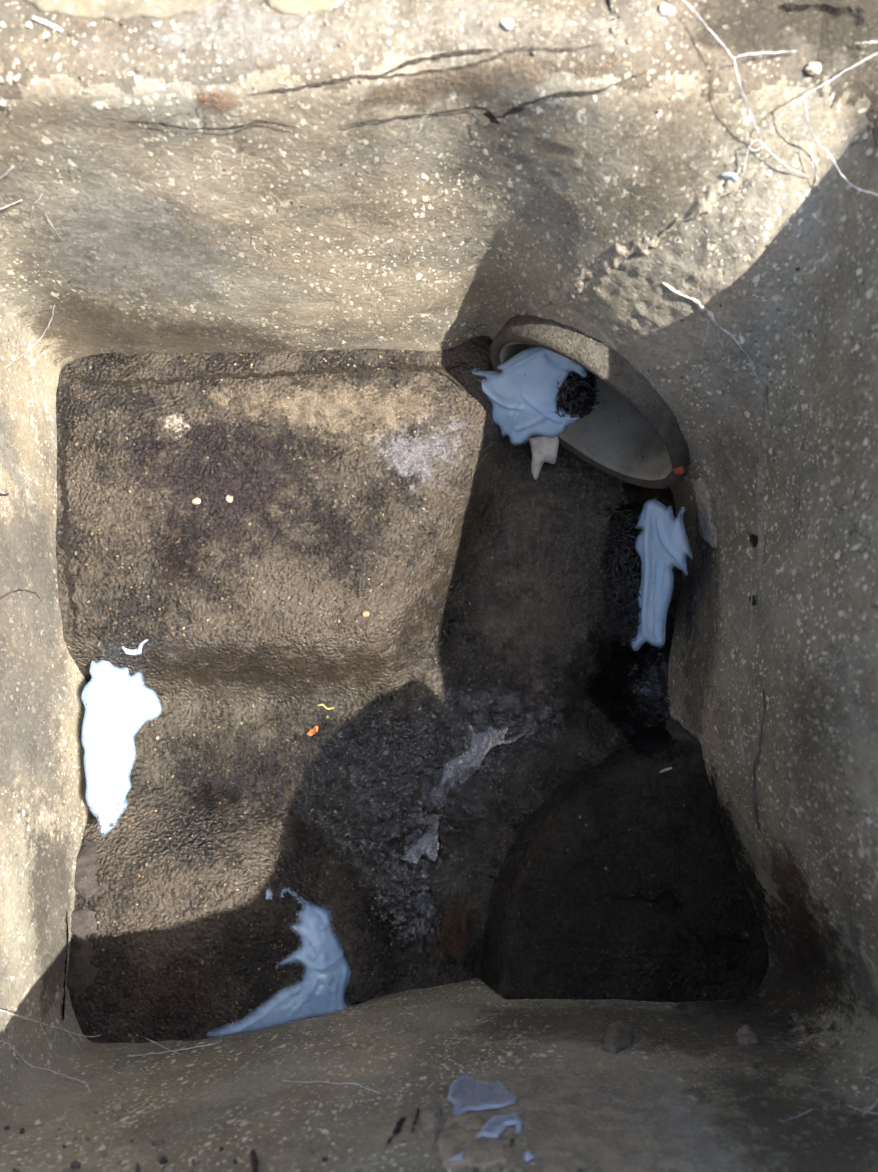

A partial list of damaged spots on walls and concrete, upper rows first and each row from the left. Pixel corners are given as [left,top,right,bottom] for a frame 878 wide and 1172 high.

crack [128,41,646,131]
damp [99,404,385,591]
damp [135,488,493,700]
damp [477,457,659,678]
damp [476,595,676,994]